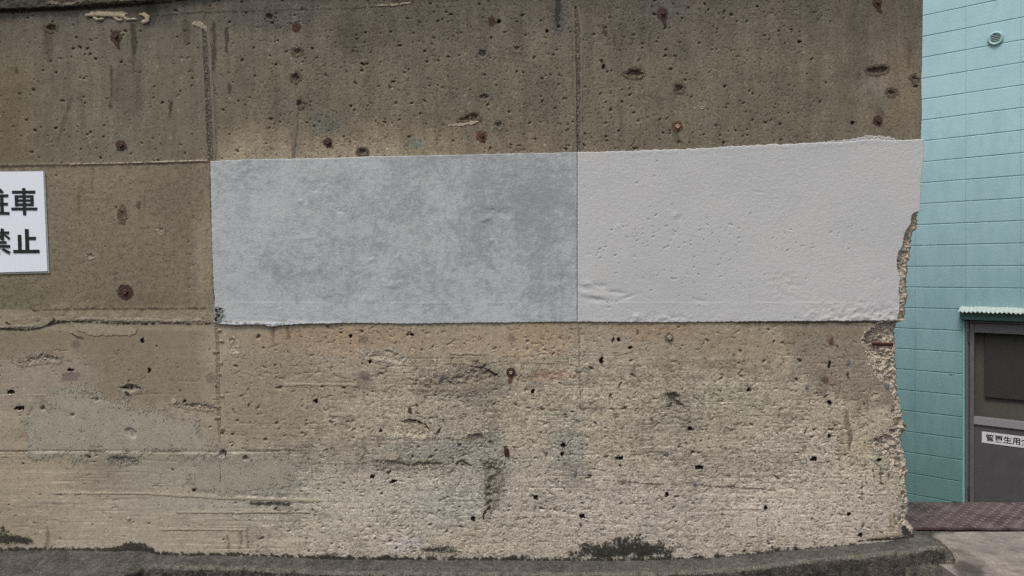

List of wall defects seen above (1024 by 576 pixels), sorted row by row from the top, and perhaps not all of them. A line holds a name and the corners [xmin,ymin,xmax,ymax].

spalling [860,211,919,532]
leakage [0,526,855,561]